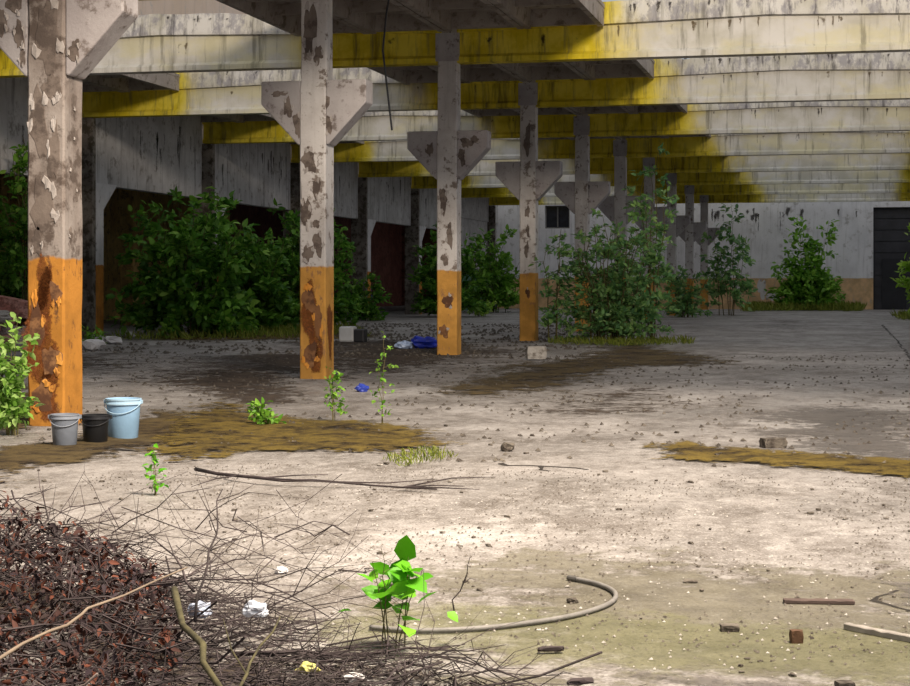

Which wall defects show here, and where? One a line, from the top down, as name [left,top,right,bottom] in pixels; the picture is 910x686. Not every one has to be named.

peeling [301,1,324,67]
peeling [0,0,81,256]
peeling [270,91,300,138]
peeling [316,82,333,135]
peeling [458,135,480,167]
peeling [300,146,325,264]
peeling [439,188,454,266]
rust [21,254,59,421]
rust [301,278,333,372]
peeling [441,292,454,309]
crack [877,325,910,361]